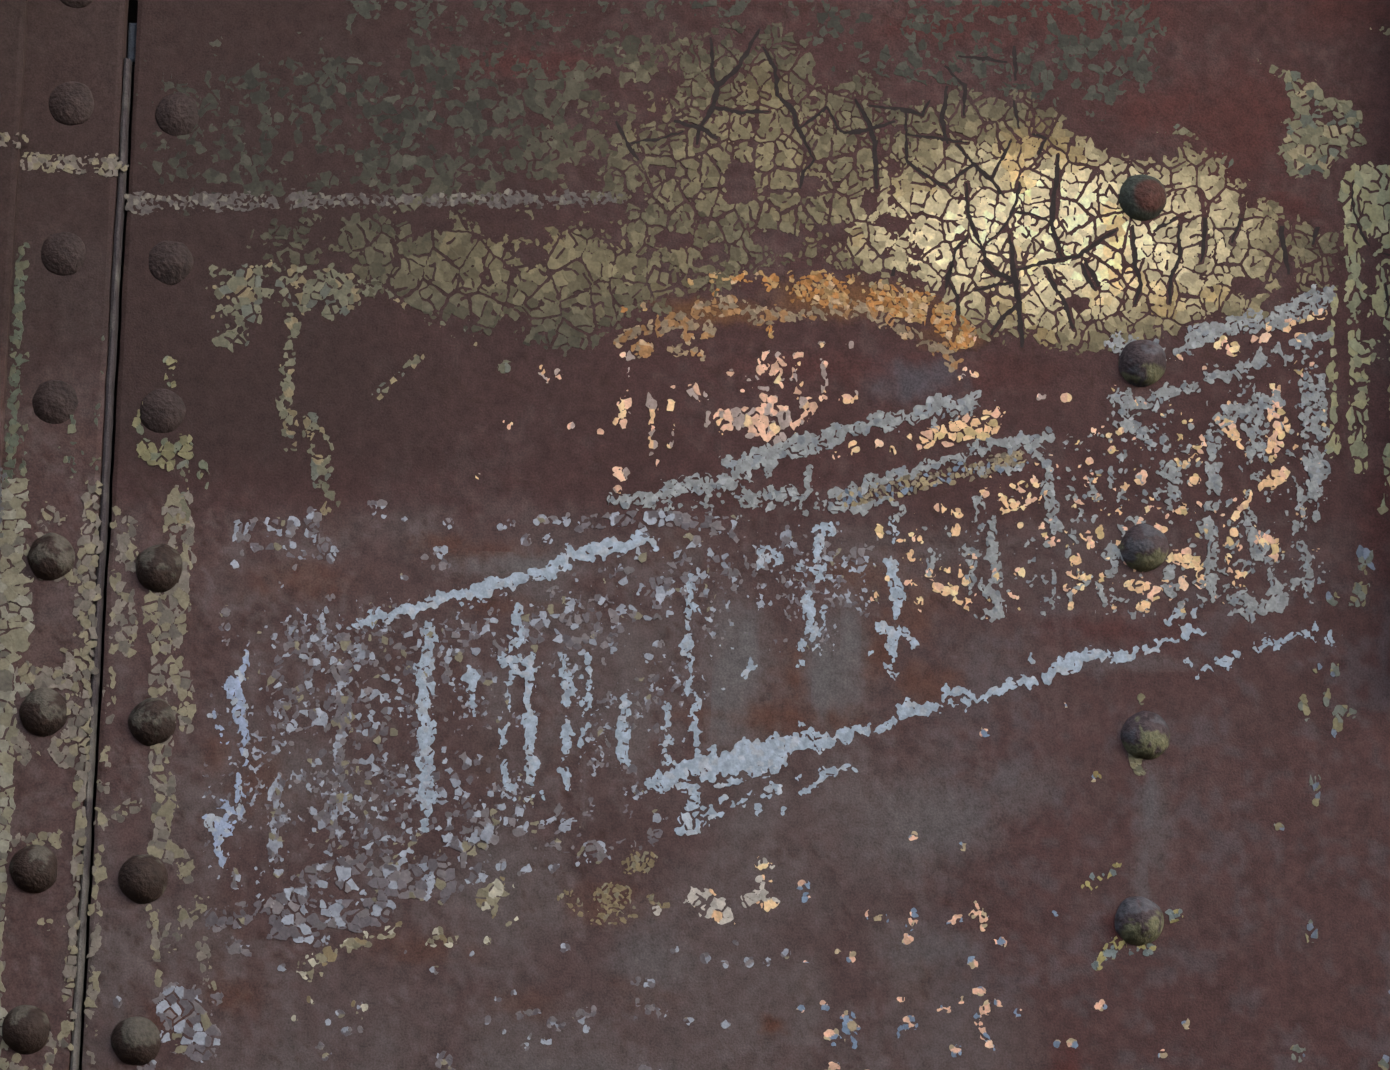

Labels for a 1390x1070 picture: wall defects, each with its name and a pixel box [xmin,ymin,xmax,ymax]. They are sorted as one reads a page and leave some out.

peeling [1269,65,1367,179]
crack [615,28,1243,348]
crack [1278,226,1320,275]
crack [1351,182,1390,314]
peeling [646,382,709,467]
rust [224,526,620,624]
peeling [875,556,919,680]
rust [786,540,1243,744]
rust [1351,411,1390,635]
rust [193,721,307,838]
peeling [646,858,780,925]
rust [347,923,582,1032]